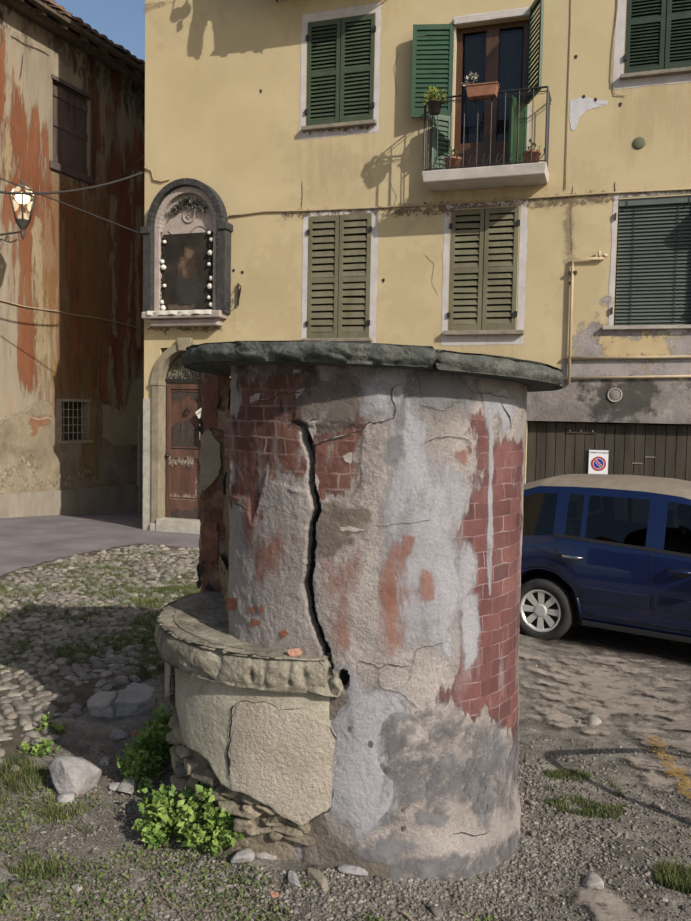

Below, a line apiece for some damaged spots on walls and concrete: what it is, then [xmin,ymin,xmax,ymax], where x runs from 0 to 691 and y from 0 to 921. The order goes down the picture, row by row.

peeling [561,322,691,381]
flaking render [224,365,365,519]
crack [422,392,514,430]
crack [232,382,407,676]
flaking render [436,409,524,759]
crack [360,641,447,708]
crack [226,700,303,779]
water stain [378,702,519,827]
water stain [356,831,520,881]